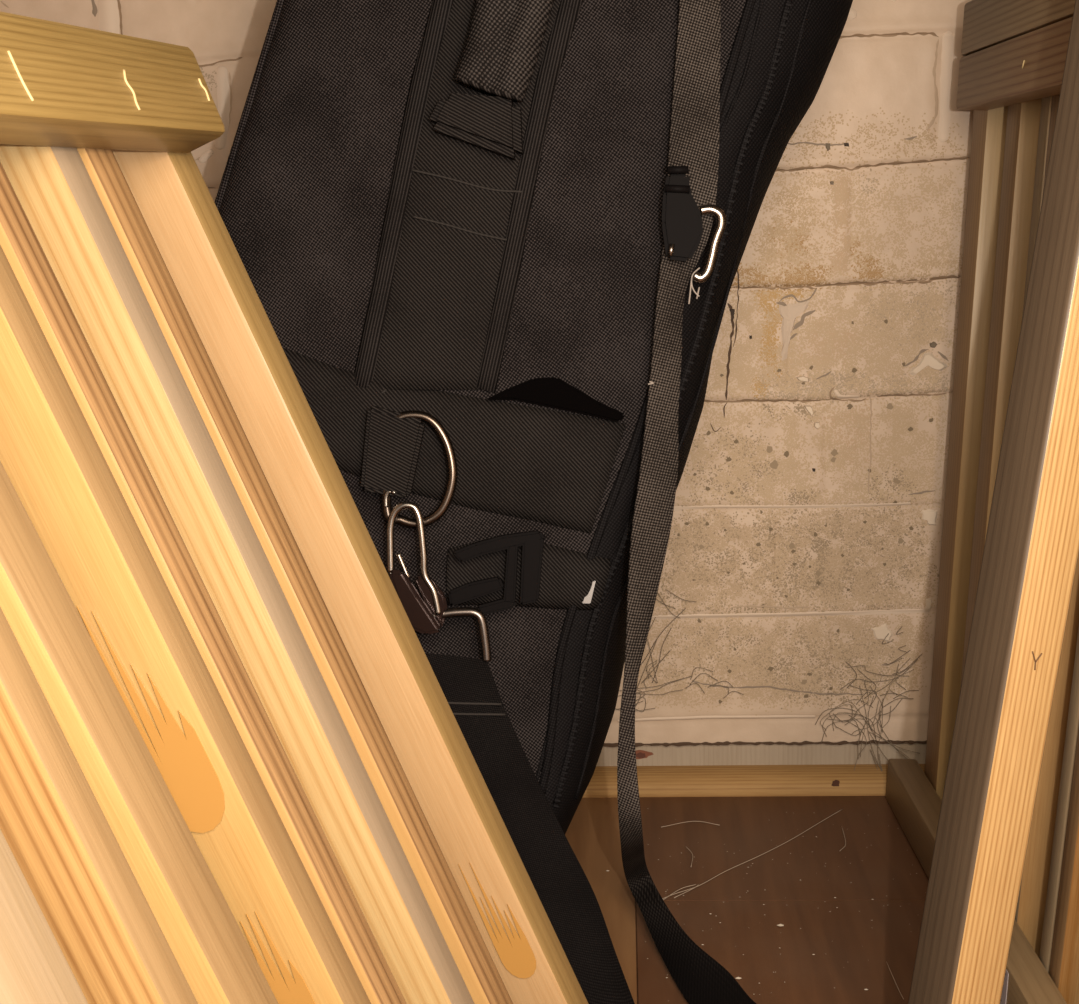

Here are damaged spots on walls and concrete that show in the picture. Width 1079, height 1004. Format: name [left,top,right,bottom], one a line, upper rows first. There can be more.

crack [693,681,863,696]
crack [603,739,927,747]